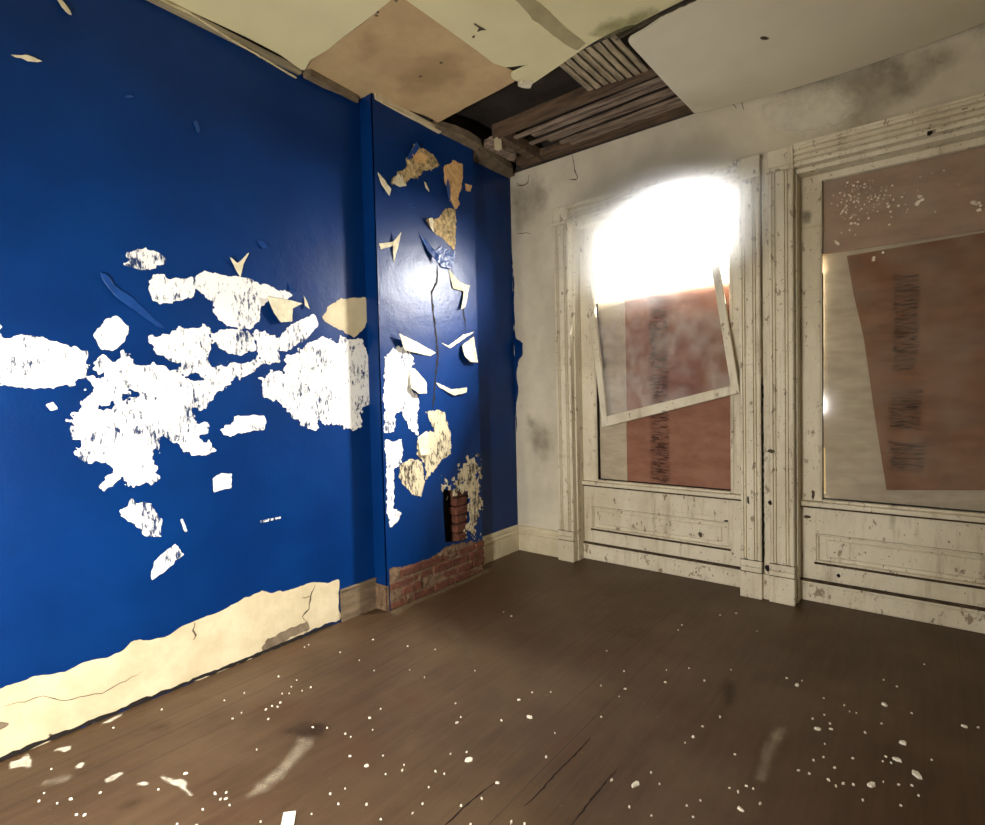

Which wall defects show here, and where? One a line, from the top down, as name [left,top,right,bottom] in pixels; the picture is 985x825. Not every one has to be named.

peeling [378,121,516,309]
peeling [0,248,370,492]
crack [430,264,466,407]
peeling [120,499,162,537]
peeling [151,544,184,580]
flaking render [375,332,485,612]
flaking render [0,579,341,759]